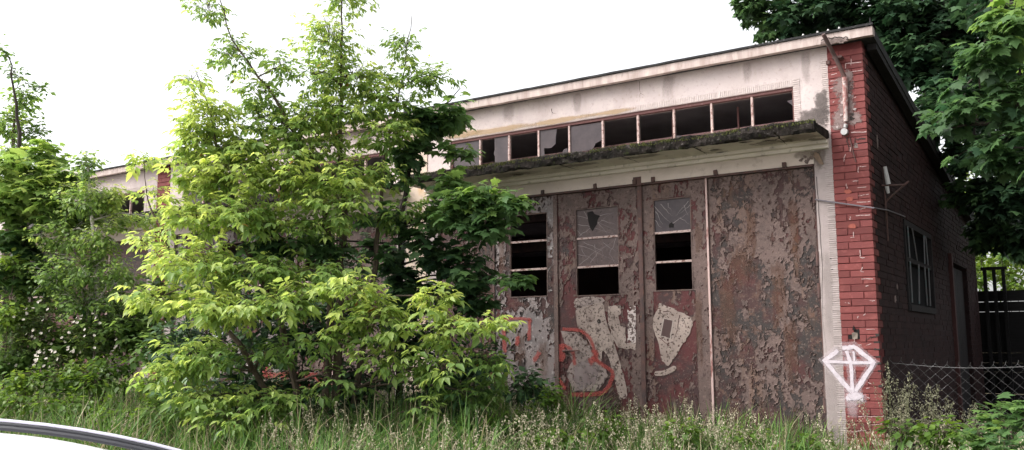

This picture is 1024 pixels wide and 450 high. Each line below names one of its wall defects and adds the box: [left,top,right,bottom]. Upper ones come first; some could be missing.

leakage [800,90,829,127]
spalling [829,61,867,160]
peeling [844,166,870,238]
peeling [444,152,824,443]